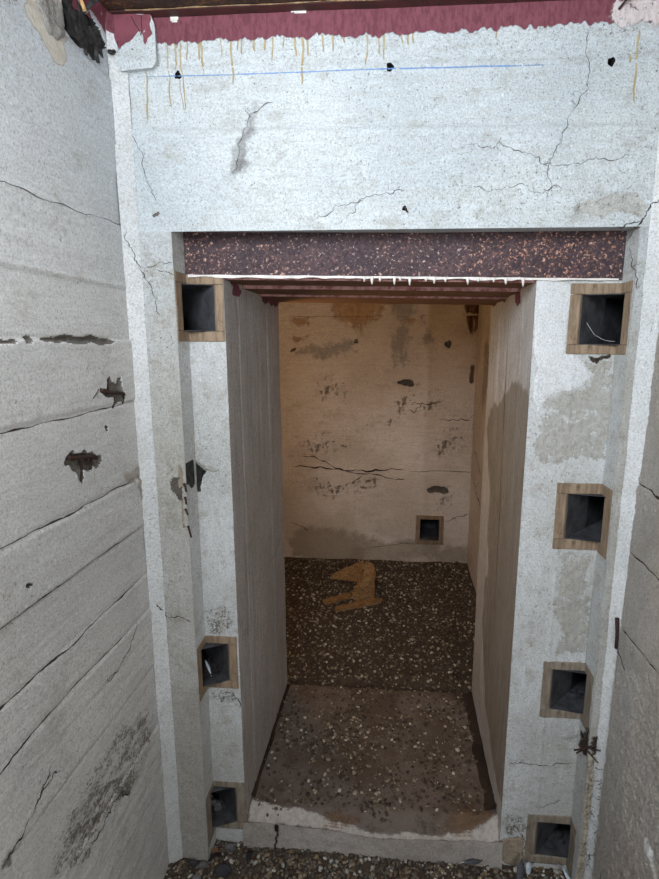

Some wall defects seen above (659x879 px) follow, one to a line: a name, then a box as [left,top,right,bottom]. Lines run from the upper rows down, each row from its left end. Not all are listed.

spalling [24,0,116,68]
corrosion [167,41,204,108]
corrosion [220,37,309,84]
peeling [152,0,659,45]
corrosion [629,31,640,100]
crack [459,33,641,196]
crack [0,400,135,434]
spalling [93,370,128,438]
spalling [60,442,105,492]
crack [293,456,428,484]
crack [0,573,145,710]
crack [0,625,137,774]